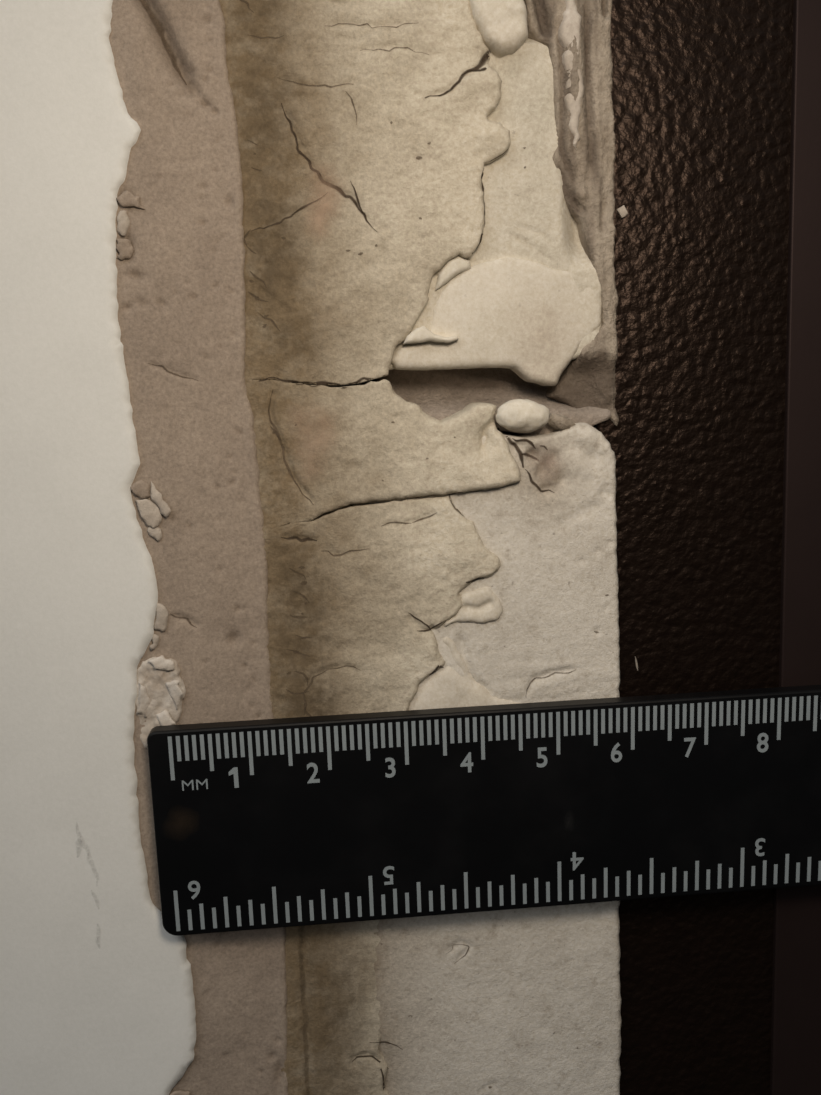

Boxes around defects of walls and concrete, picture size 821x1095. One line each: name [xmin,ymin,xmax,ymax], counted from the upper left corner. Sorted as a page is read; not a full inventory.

crack [425,50,491,98]
peeling [116,190,144,260]
crack [244,80,376,329]
peeling [435,256,471,291]
peeling [403,326,459,344]
spalling [373,368,611,493]
peeling [130,480,171,541]
crack [281,536,365,556]
crack [287,571,357,716]
crack [409,613,446,632]
peeling [135,603,186,749]
crack [352,1041,403,1090]